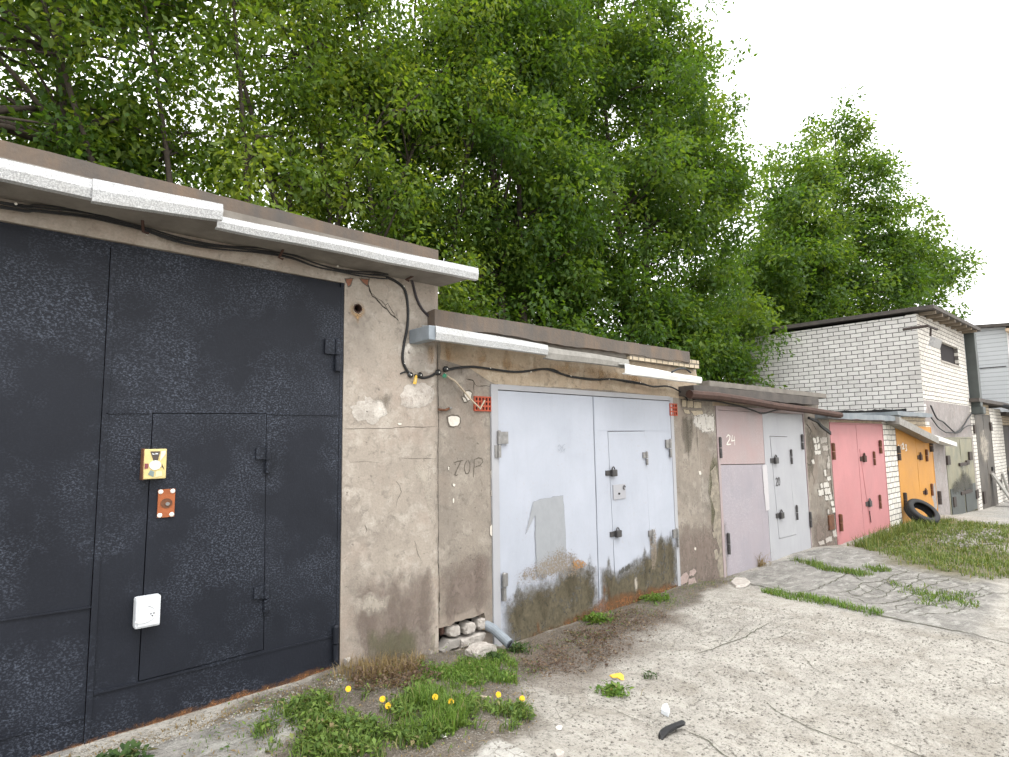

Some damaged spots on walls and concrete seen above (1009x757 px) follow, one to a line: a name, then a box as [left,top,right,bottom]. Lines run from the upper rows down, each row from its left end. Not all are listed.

crack [368,284,398,320]
flaking render [681,399,715,430]
leakage [683,414,715,450]
flaking render [811,436,835,515]
corrosion [557,585,676,628]